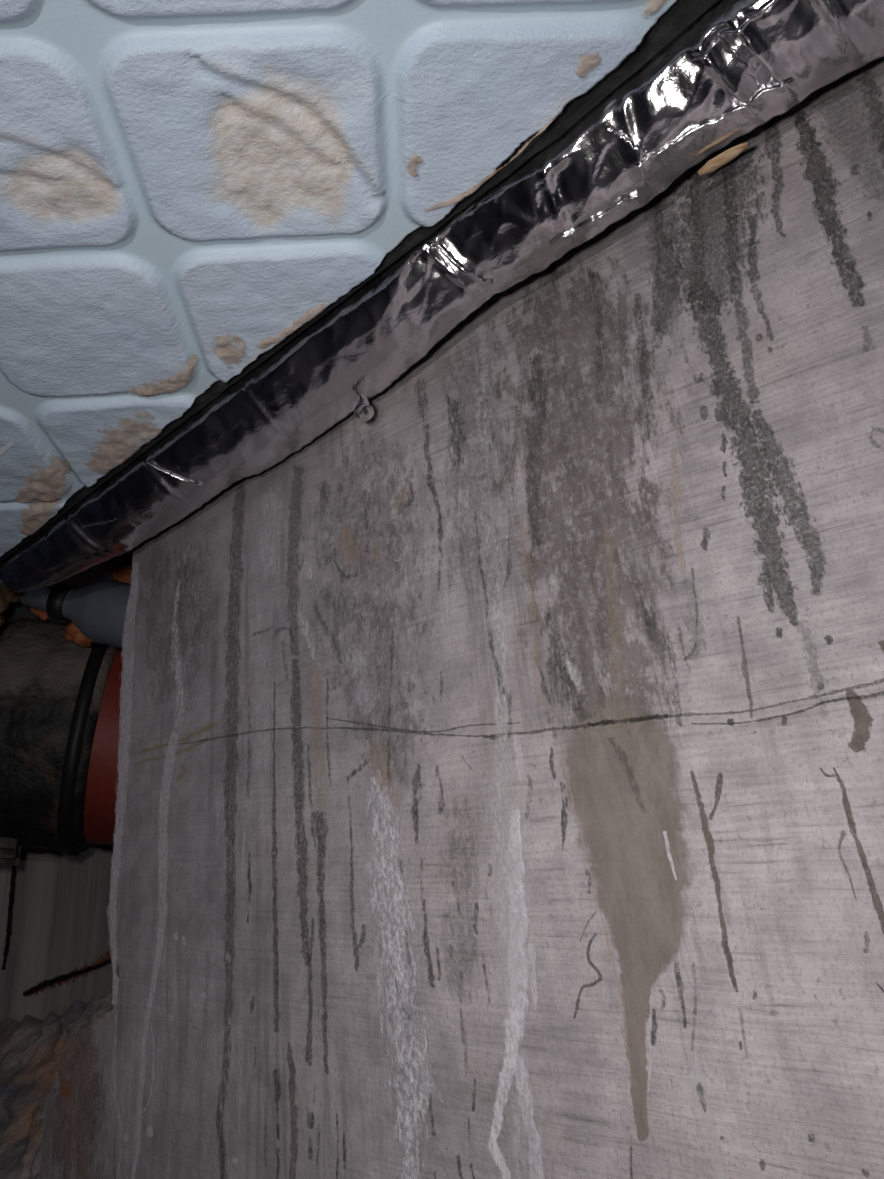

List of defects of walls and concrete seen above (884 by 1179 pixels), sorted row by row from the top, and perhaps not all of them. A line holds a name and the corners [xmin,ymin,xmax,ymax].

water stain [670,118,825,638]
water stain [795,111,866,307]
water stain [347,757,444,1179]
water stain [448,264,689,1179]
water stain [690,771,738,992]
crack [589,691,884,727]